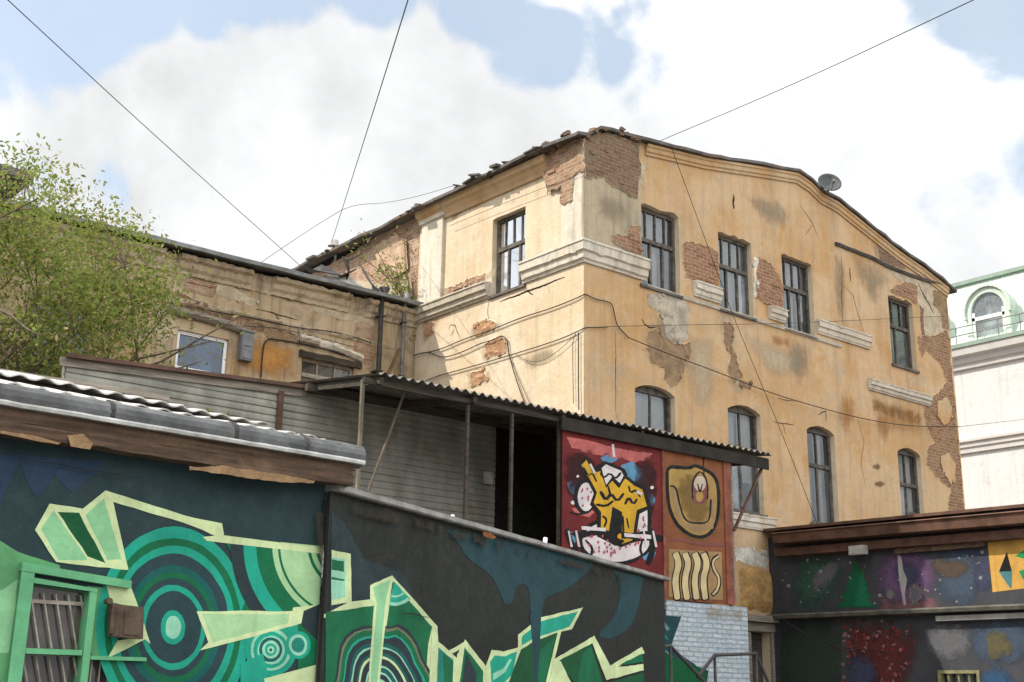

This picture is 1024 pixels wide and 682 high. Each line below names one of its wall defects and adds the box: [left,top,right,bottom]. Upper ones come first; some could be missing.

flaking render [540,126,648,205]
flaking render [612,224,643,256]
flaking render [682,241,720,286]
flaking render [752,257,784,308]
flaking render [470,318,508,388]
flaking render [646,293,691,388]
flaking render [722,314,753,392]
flaking render [876,244,964,511]
flaking render [735,546,769,569]